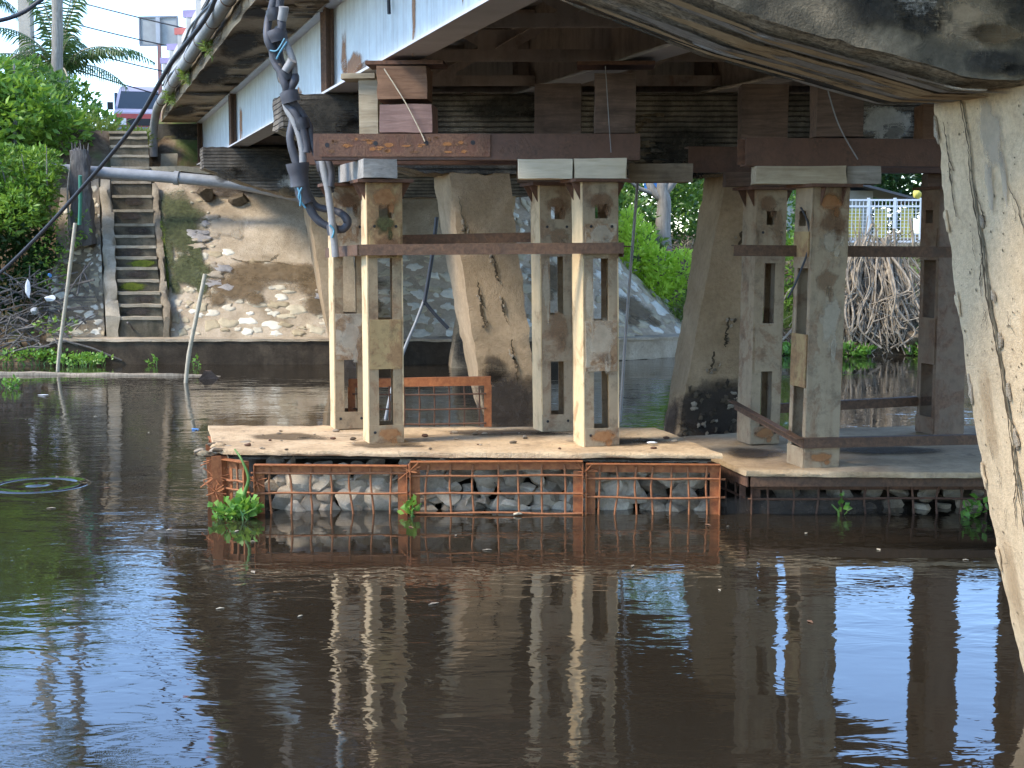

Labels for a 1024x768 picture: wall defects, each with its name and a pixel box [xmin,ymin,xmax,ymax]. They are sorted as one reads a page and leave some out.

crack [476,254,518,380]
crack [706,318,737,374]
crack [943,100,1024,564]
water stain [449,356,575,442]
water stain [619,379,738,445]